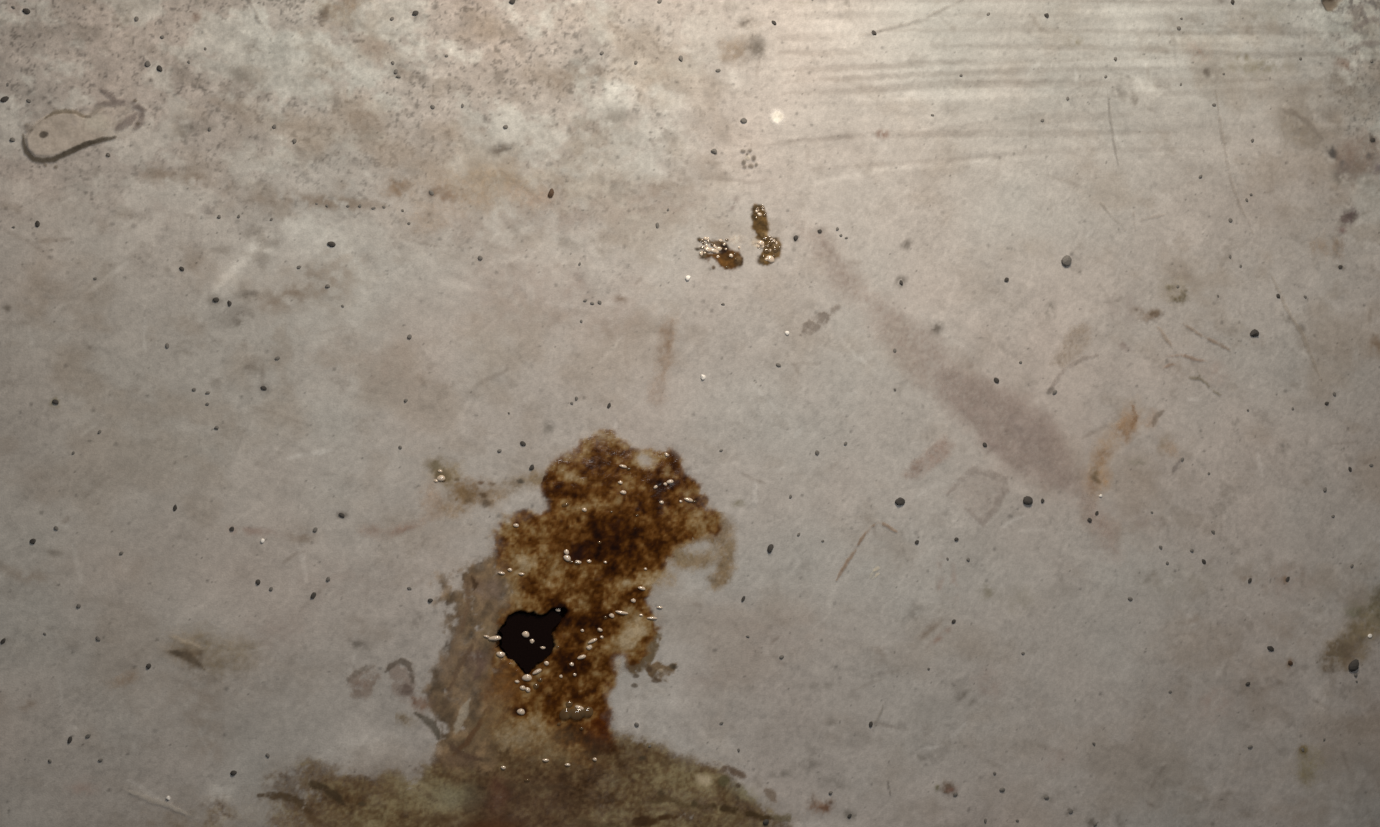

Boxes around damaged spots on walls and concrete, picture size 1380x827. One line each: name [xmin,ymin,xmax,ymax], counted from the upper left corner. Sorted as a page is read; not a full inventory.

damp [258,430,791,827]